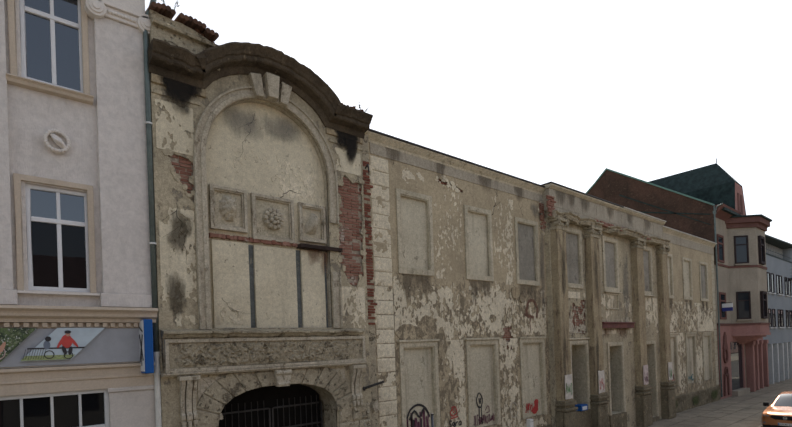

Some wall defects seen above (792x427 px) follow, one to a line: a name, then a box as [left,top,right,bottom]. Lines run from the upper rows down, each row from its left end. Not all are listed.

flaking render [155,99,197,327]
flaking render [335,147,377,328]
peeling [393,175,547,427]
peeling [670,301,714,393]